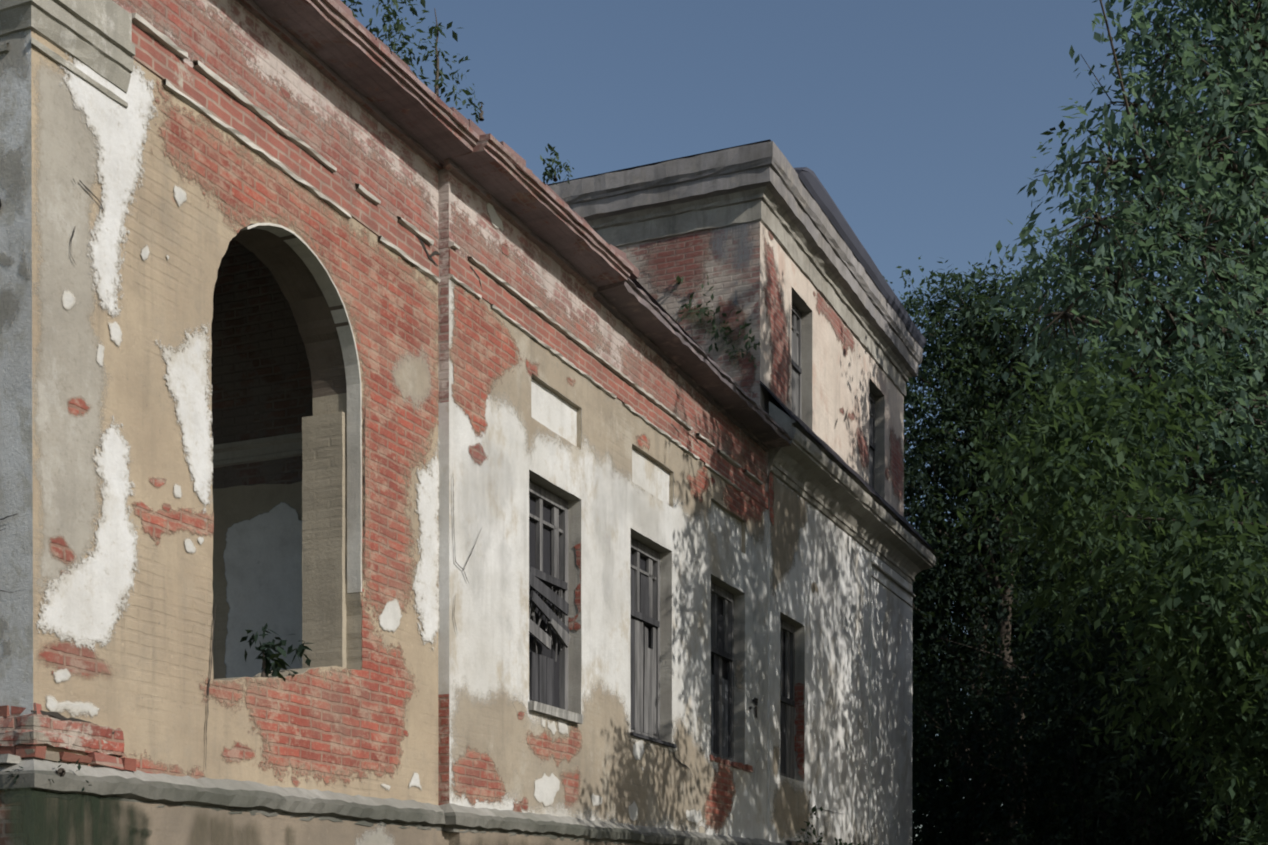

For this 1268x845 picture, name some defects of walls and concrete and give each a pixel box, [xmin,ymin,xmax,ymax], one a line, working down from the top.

flaking render [0,0,808,791]
flaking render [813,292,855,356]
flaking render [840,408,870,469]
flaking render [885,428,904,502]
peeling [449,683,736,834]
peeling [771,683,811,841]